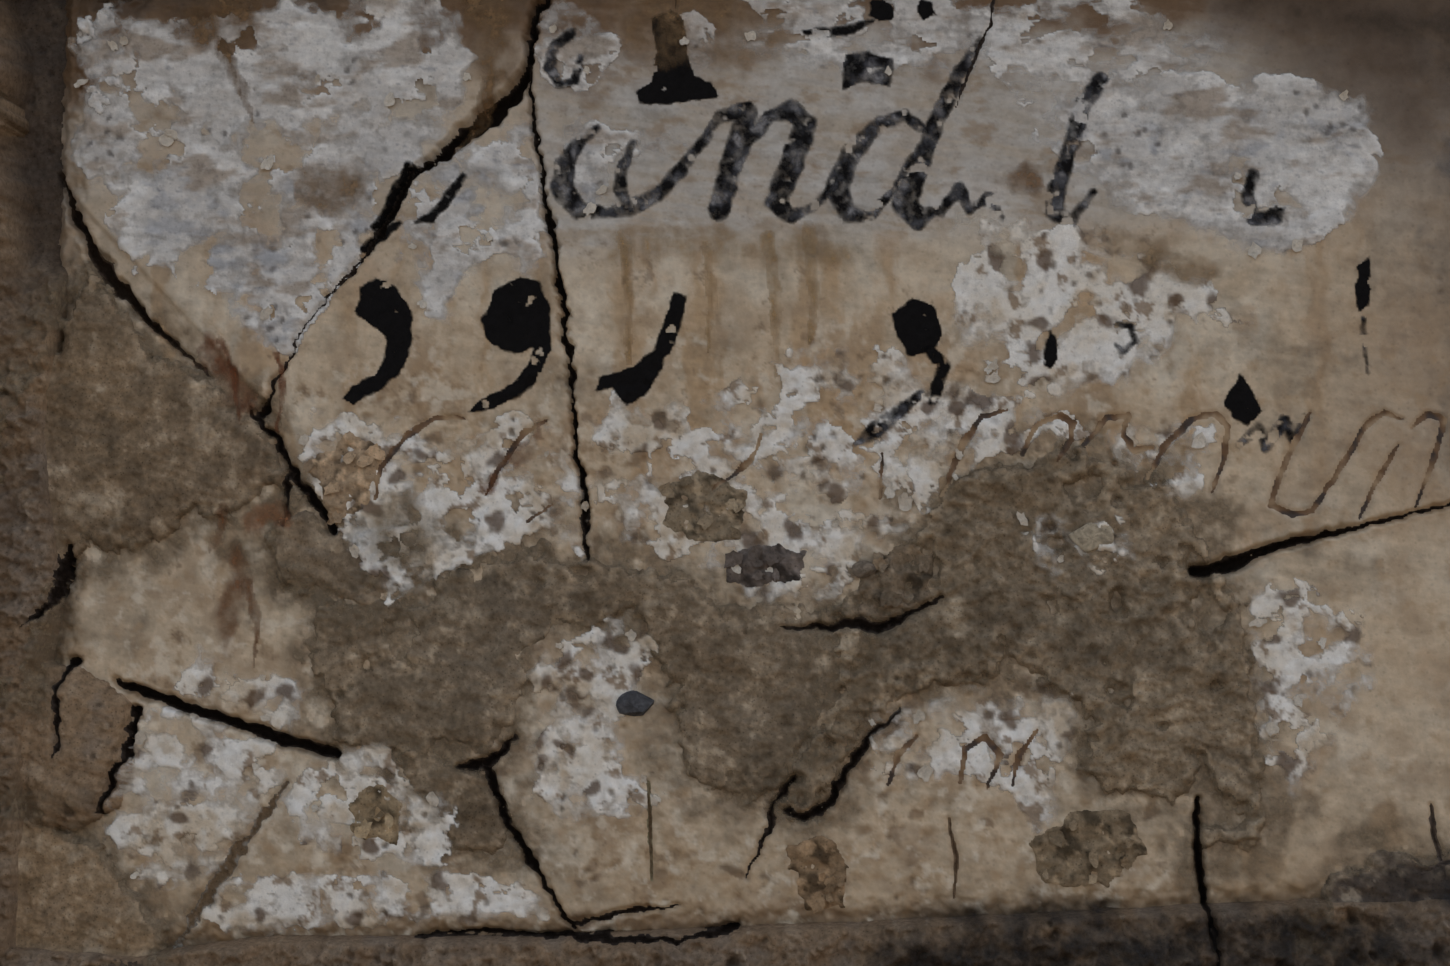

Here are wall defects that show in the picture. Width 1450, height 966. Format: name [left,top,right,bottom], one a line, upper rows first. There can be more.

peeling [71,0,548,355]
peeling [743,0,1383,259]
crack [250,0,591,561]
crack [19,544,77,627]
crack [1188,502,1450,577]
crack [51,657,83,759]
crack [95,678,342,814]
crack [173,781,290,949]
peeling [528,617,661,819]
spalling [786,835,849,914]
peeling [868,684,1148,888]
crack [1192,796,1222,965]